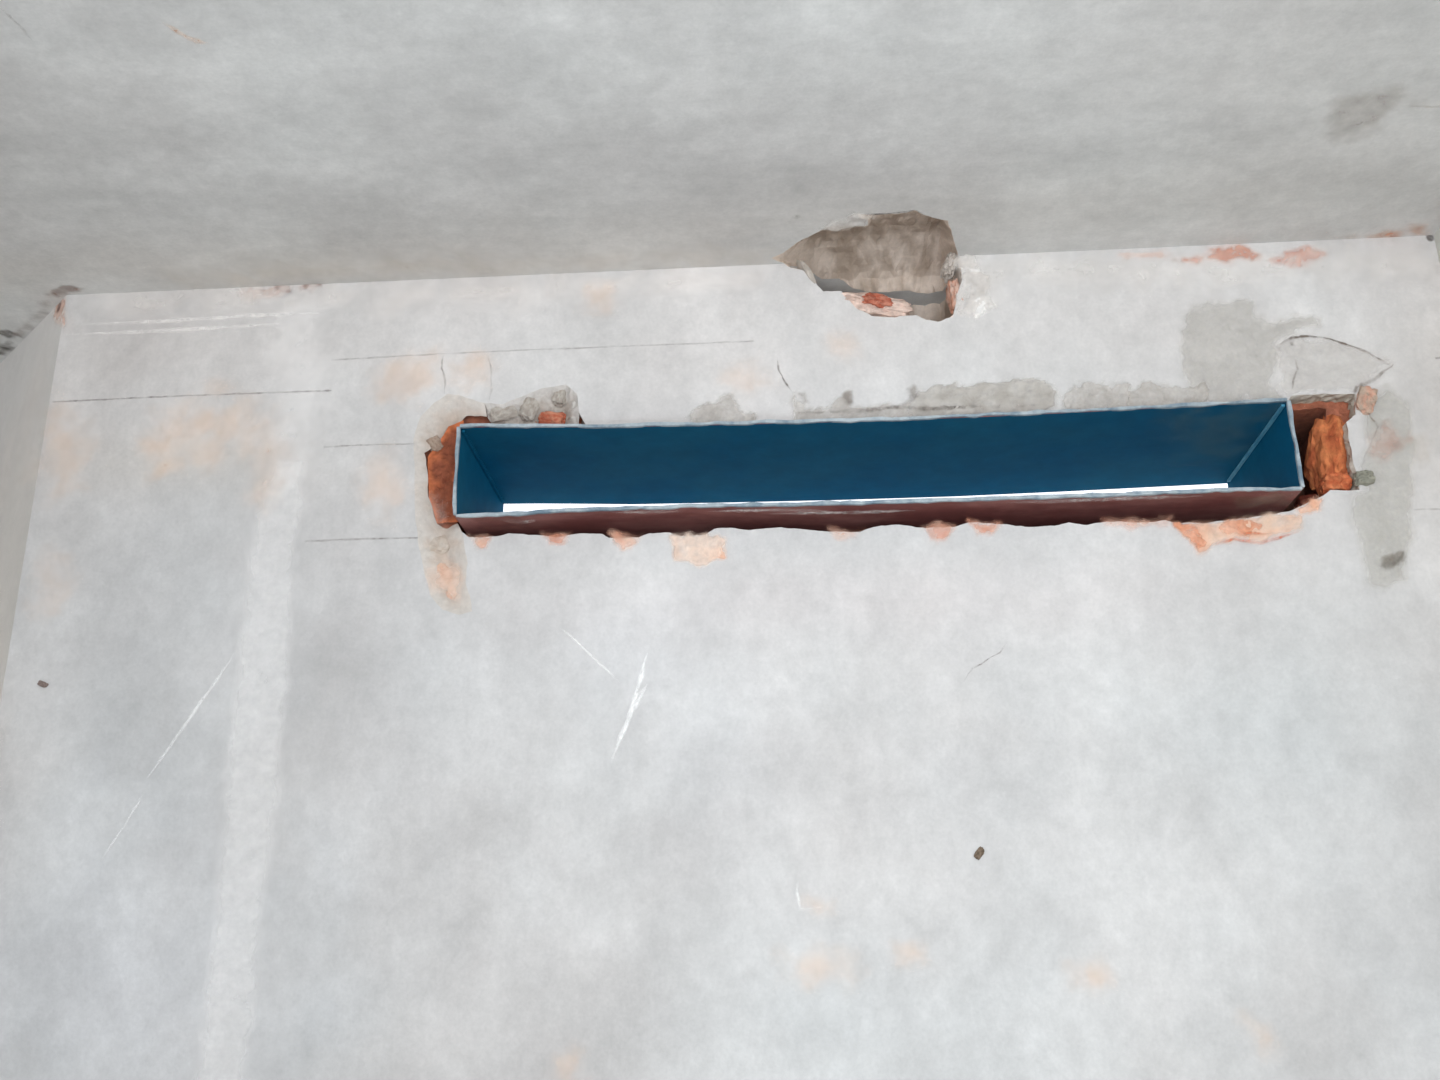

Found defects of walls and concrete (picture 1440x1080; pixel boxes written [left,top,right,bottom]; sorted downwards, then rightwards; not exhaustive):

flaking render [796,260,817,284]
spalling [1174,394,1359,551]